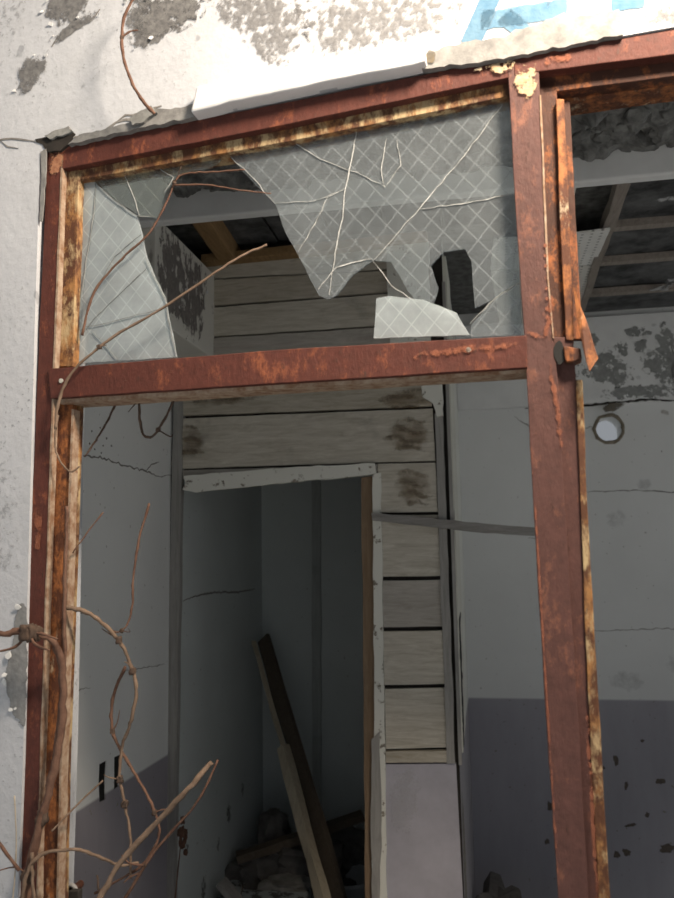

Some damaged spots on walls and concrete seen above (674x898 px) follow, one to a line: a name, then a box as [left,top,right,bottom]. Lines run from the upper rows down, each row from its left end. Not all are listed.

peeling [40,0,99,43]
peeling [123,0,464,64]
crack [0,138,38,149]
rust [49,152,63,174]
spalling [163,110,513,198]
spalling [571,101,674,162]
rust [414,342,517,358]
rust [550,370,563,446]
crack [584,338,674,429]
crack [83,455,172,477]
crack [589,487,674,495]
rust [535,507,555,809]